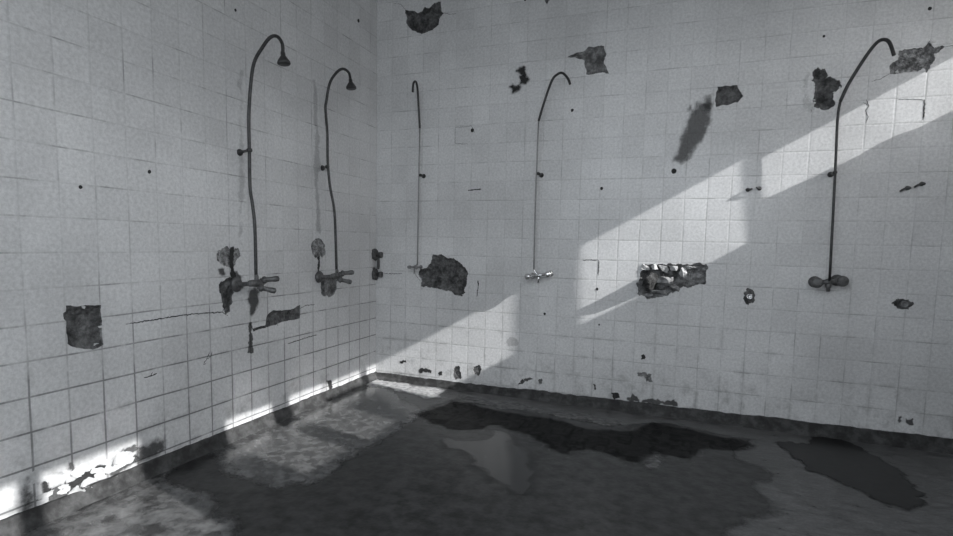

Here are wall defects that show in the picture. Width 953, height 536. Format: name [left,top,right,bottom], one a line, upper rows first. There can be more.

spalling [405,2,444,34]
peeling [568,45,609,75]
spalling [889,39,944,74]
peeling [715,82,743,107]
spalling [811,67,842,110]
leakage [675,98,711,162]
spalling [217,246,240,314]
peeling [321,278,337,297]
spalling [418,254,468,296]
spalling [636,262,708,299]
peeling [63,305,104,350]
spalling [253,305,300,332]